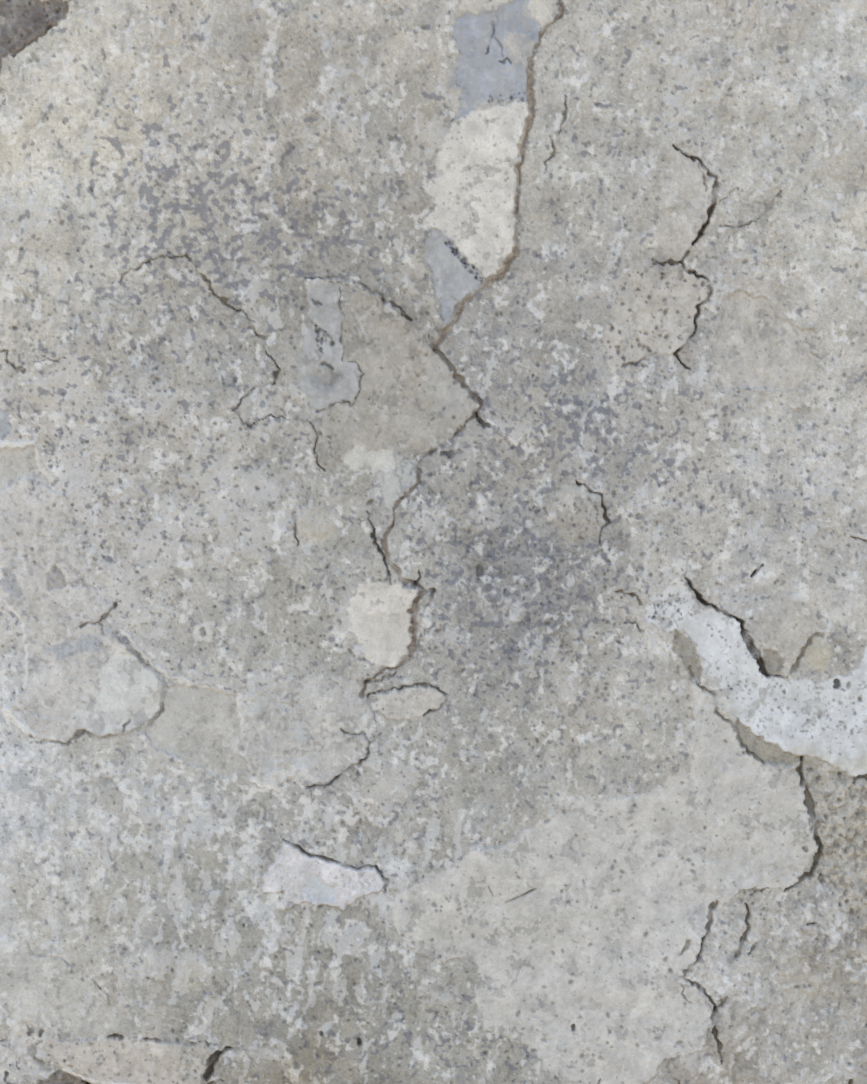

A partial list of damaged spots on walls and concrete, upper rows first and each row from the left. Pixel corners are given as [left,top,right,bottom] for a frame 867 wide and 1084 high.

spalling [0,0,73,105]
crack [120,254,327,471]
crack [306,0,569,701]
peeling [424,0,559,325]
crack [620,145,777,371]
crack [291,512,300,547]
crack [688,665,766,765]
peeling [0,830,216,1084]
peeling [263,583,867,1084]
crack [679,900,728,1060]
crack [734,756,825,959]